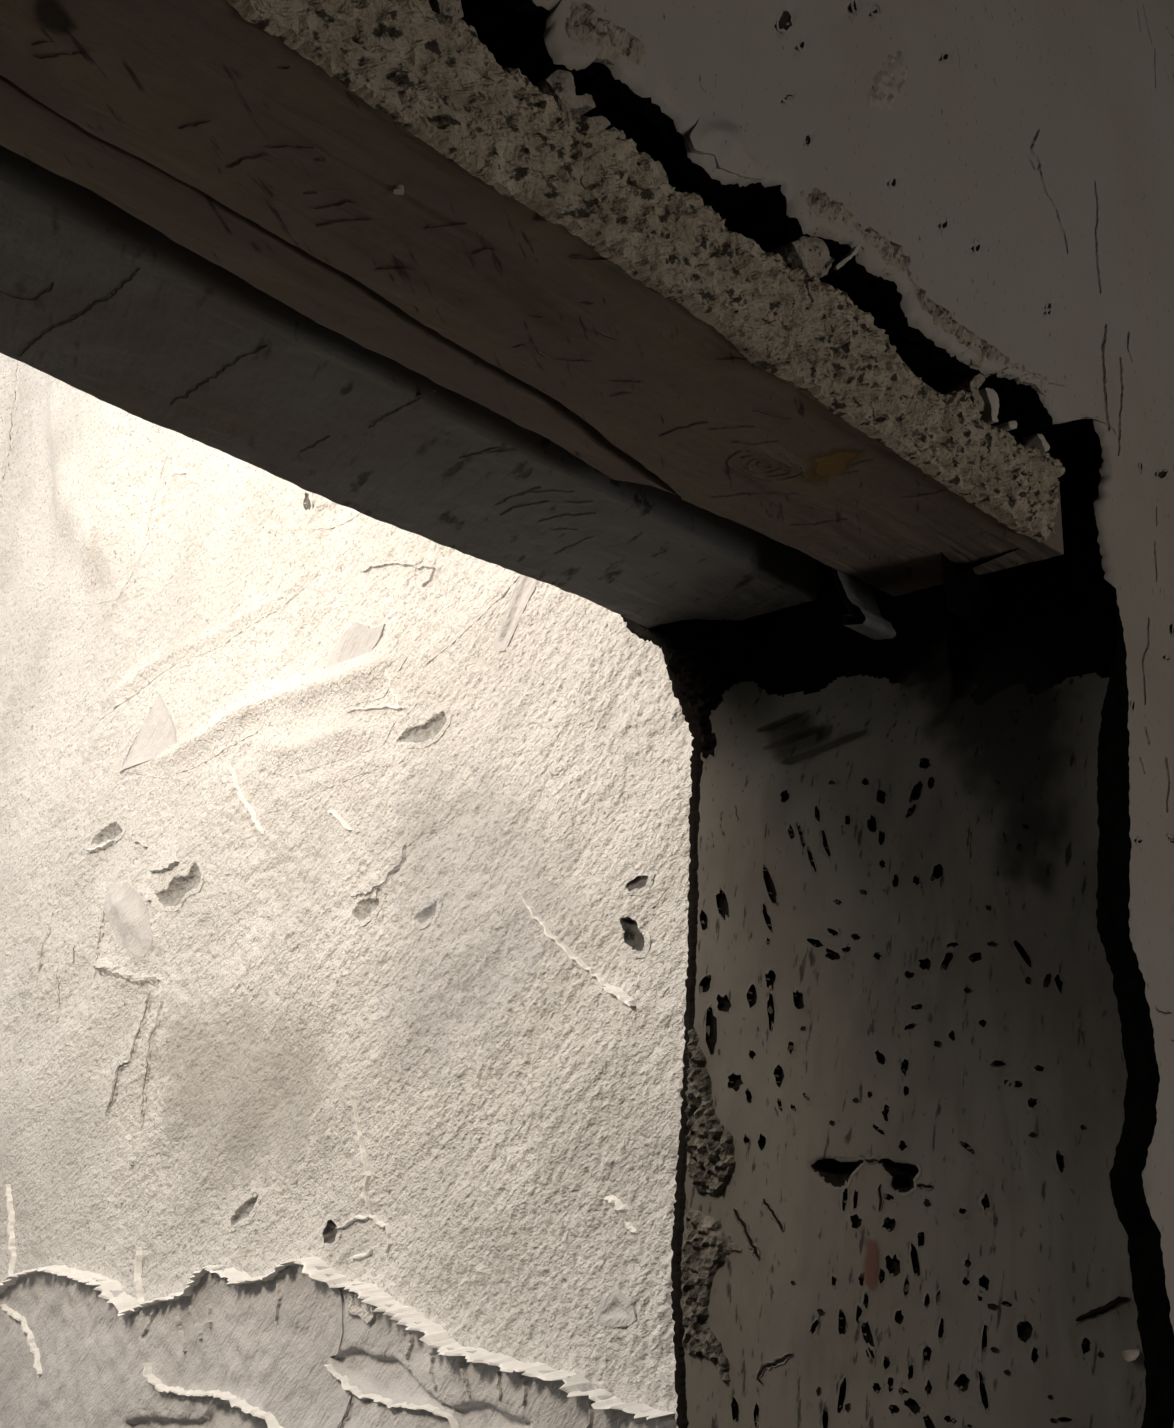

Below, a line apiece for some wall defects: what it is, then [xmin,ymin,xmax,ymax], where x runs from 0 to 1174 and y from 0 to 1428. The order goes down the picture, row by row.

crack [428,0,464,19]
crack [533,70,611,129]
crack [771,236,862,279]
crack [1028,129,1133,456]
crack [948,374,1050,452]
flaking render [86,816,148,852]
flaking render [136,858,205,912]
crack [105,989,165,1165]
spalling [227,1188,263,1232]
spalling [680,967,813,1428]
flaking render [0,1256,676,1428]
spalling [807,1180,1043,1428]